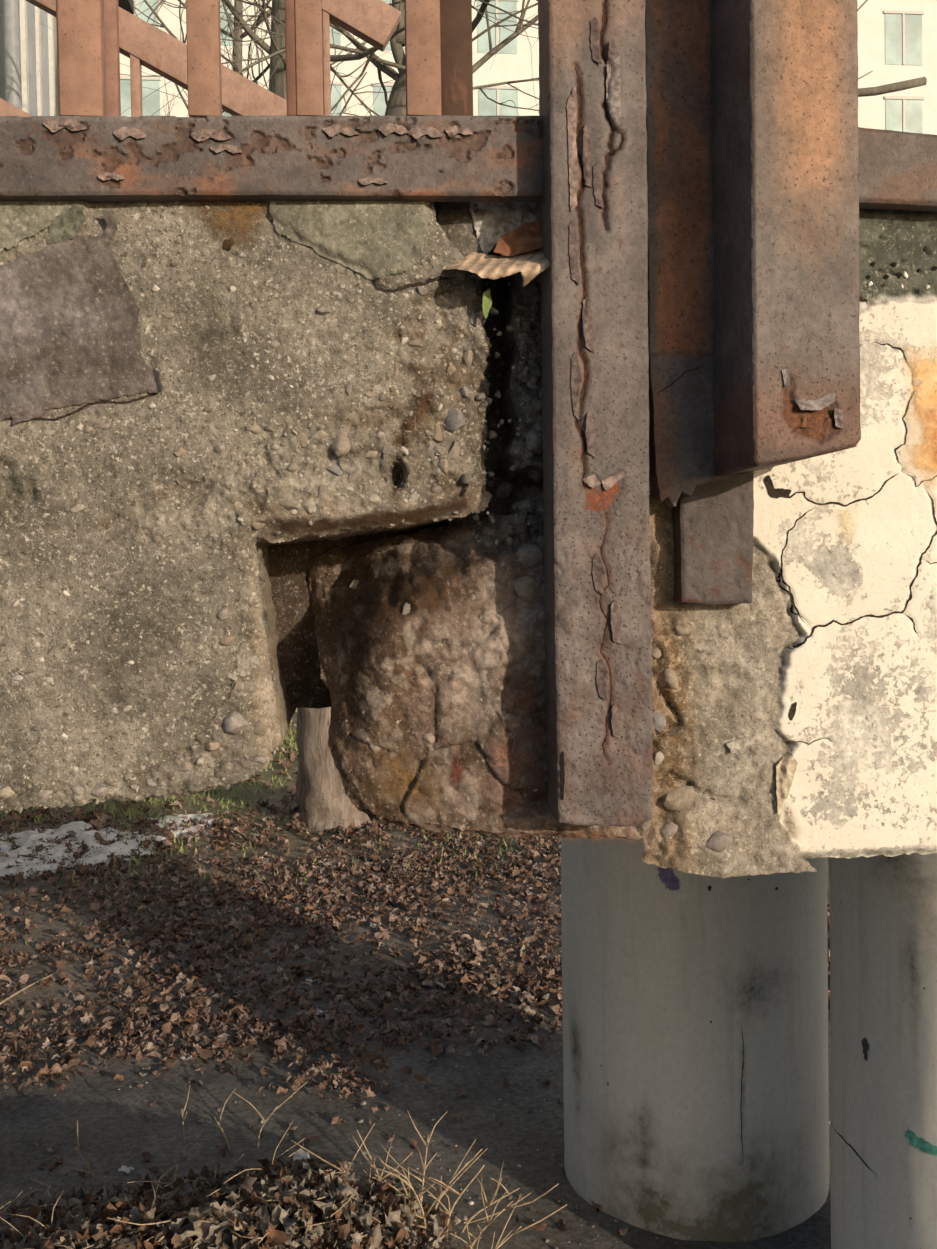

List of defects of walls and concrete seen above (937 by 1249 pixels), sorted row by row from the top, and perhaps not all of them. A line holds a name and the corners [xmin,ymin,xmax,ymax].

peeling [113,126,146,141]
peeling [190,128,243,154]
peeling [323,124,360,137]
peeling [378,123,472,139]
crack [575,0,624,482]
corrosion [783,389,835,440]
peeling [781,367,844,428]
corrosion [909,358,937,472]
corrosion [586,481,619,512]
crack [772,342,937,649]
spalling [0,274,817,891]
crack [738,1023,746,1166]